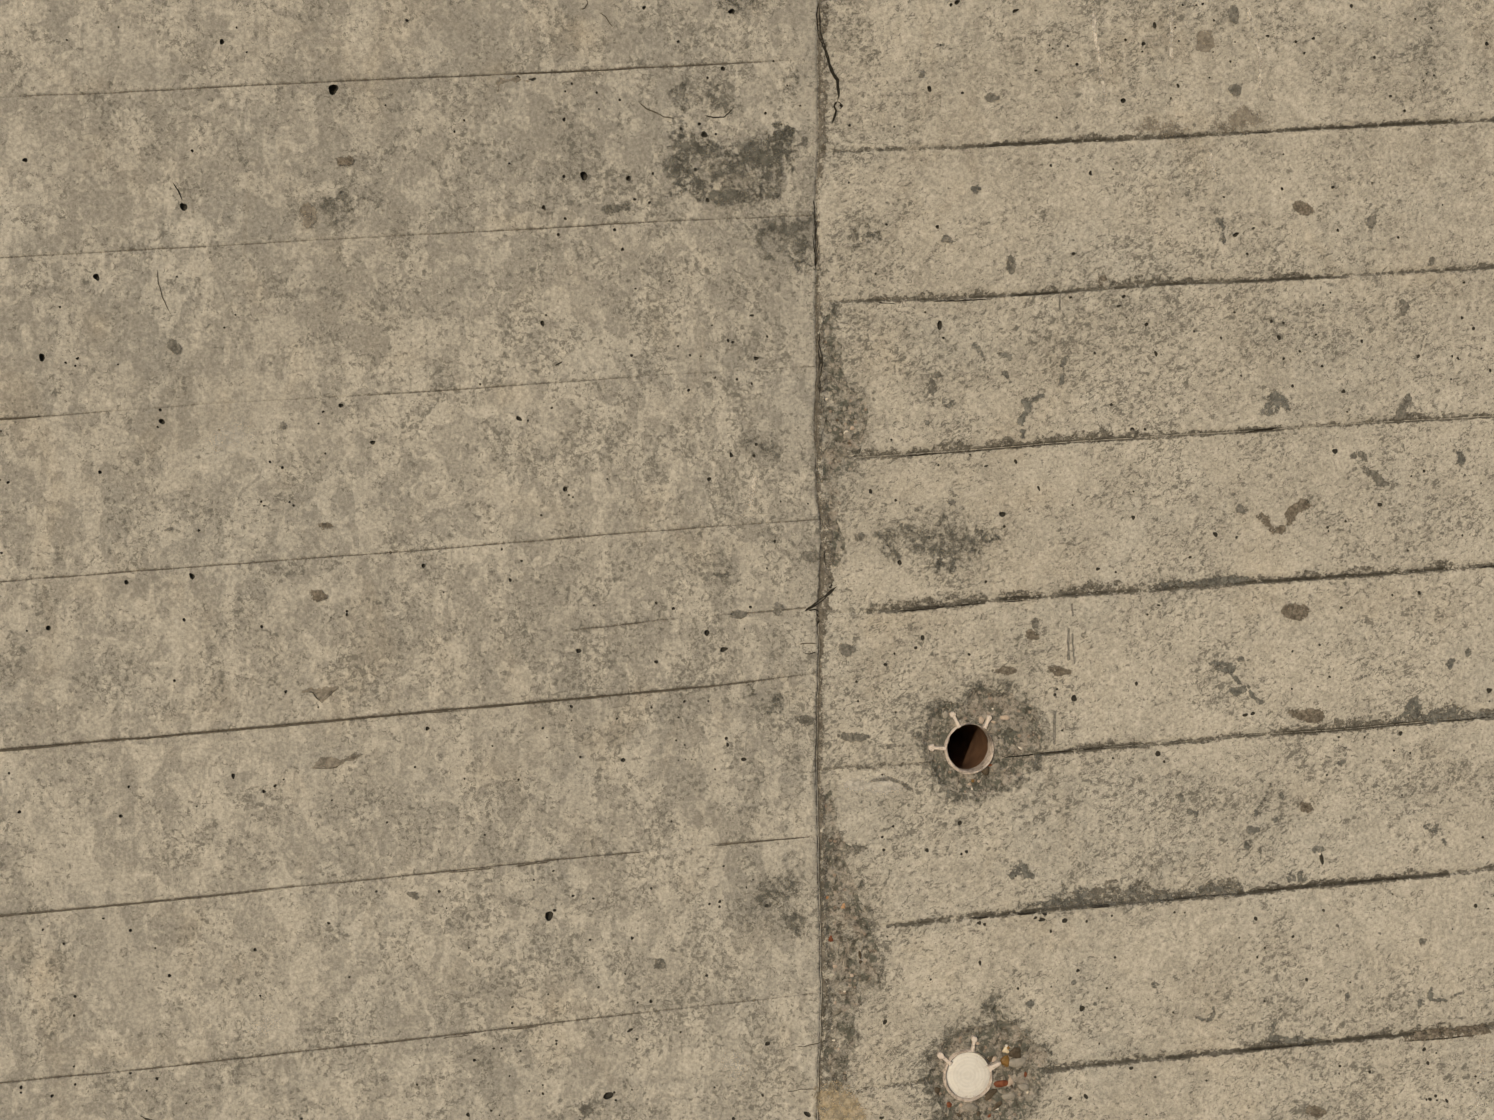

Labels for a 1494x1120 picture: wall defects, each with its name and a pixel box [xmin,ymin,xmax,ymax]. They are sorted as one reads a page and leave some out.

damp [707,84,731,114]
crack [816,2,842,123]
damp [665,123,794,205]